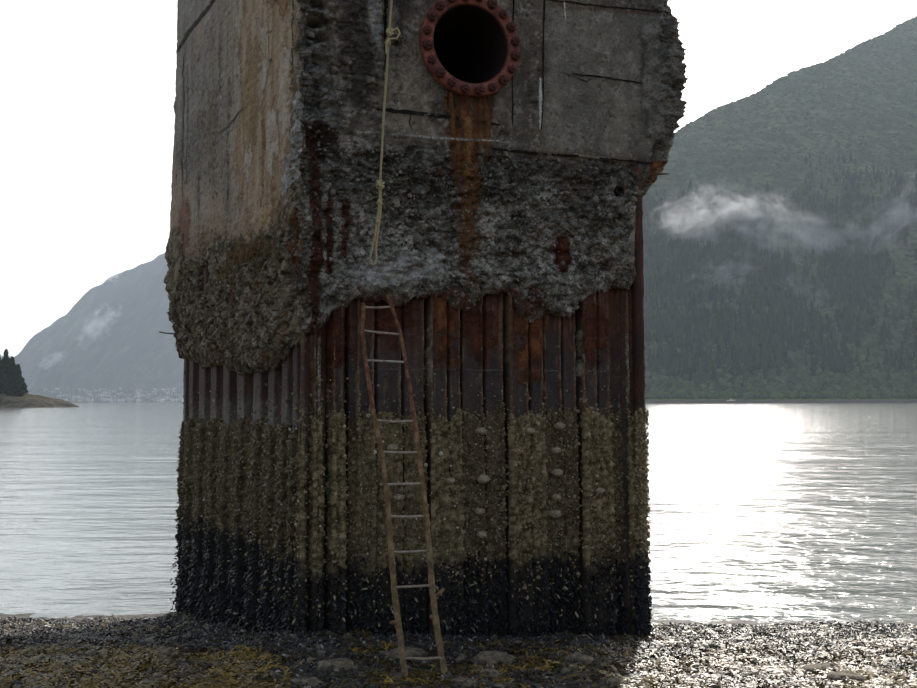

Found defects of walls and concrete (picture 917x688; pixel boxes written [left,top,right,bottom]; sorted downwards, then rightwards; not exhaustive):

crack [176,0,214,189]
crack [376,76,514,130]
crack [490,0,671,164]
spalling [664,17,681,37]
corrosion [287,134,355,383]
corrosion [372,297,420,351]
spalling [172,0,674,375]
corrosion [444,90,497,282]
corrosion [551,235,572,275]